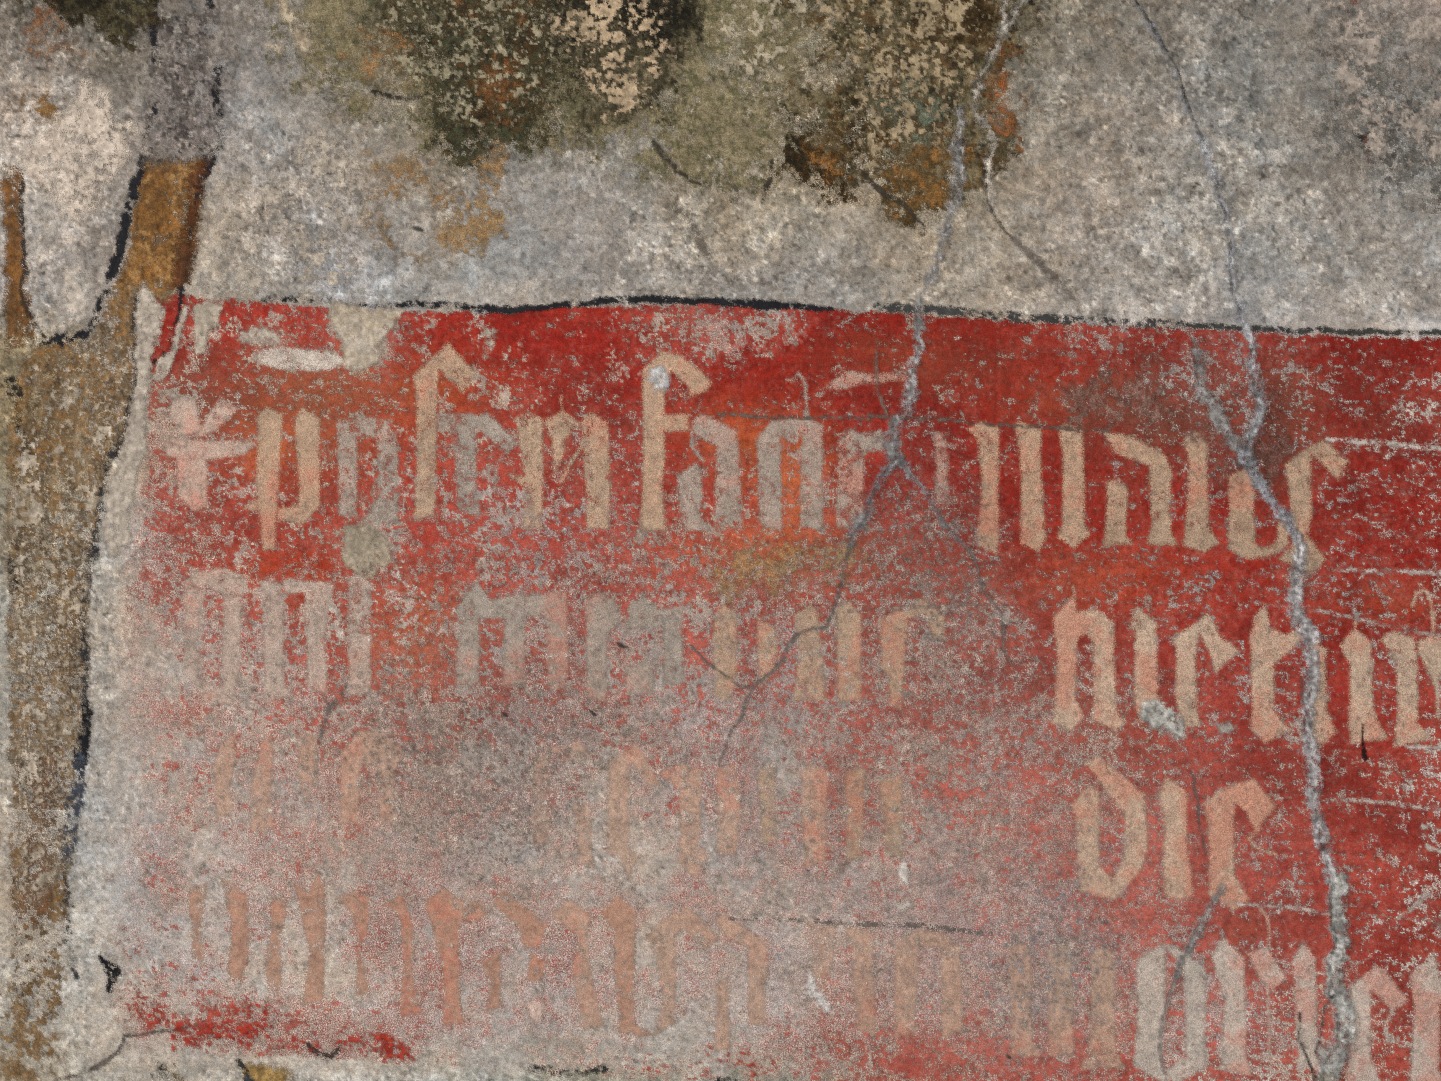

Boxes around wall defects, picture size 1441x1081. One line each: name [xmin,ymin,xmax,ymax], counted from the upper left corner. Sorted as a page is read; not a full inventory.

water stain [358,0,706,173]
water stain [775,0,1047,236]
crack [1358,132,1371,162]
crack [692,0,1075,766]
crack [1135,0,1357,1081]
crack [1361,727,1369,760]